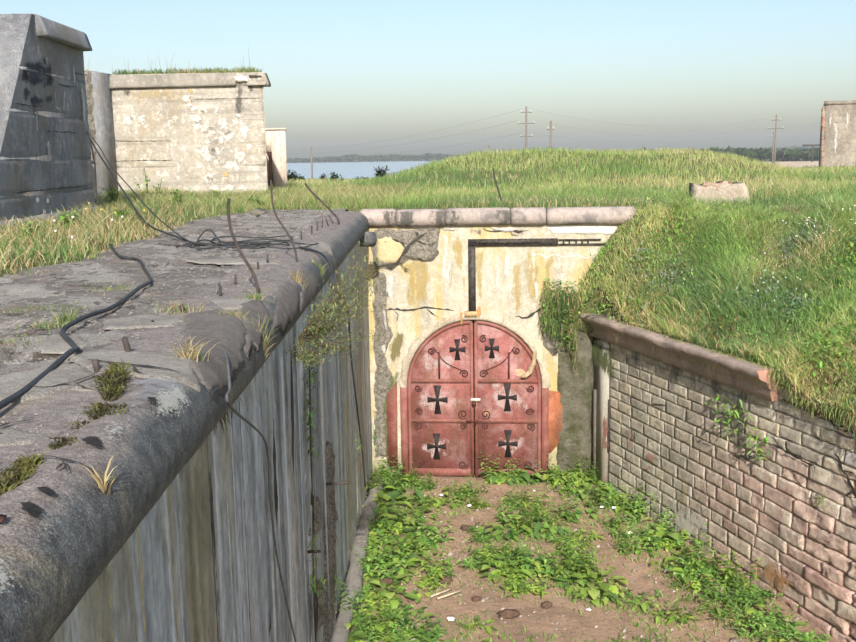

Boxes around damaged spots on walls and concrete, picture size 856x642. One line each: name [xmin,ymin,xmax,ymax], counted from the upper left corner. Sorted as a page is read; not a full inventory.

water stain [435,211,459,291]
water stain [383,274,394,316]
crack [387,306,453,321]
water stain [382,333,404,360]
spalling [371,227,458,458]
crack [782,399,856,434]
crack [771,443,815,470]
crack [834,453,856,498]